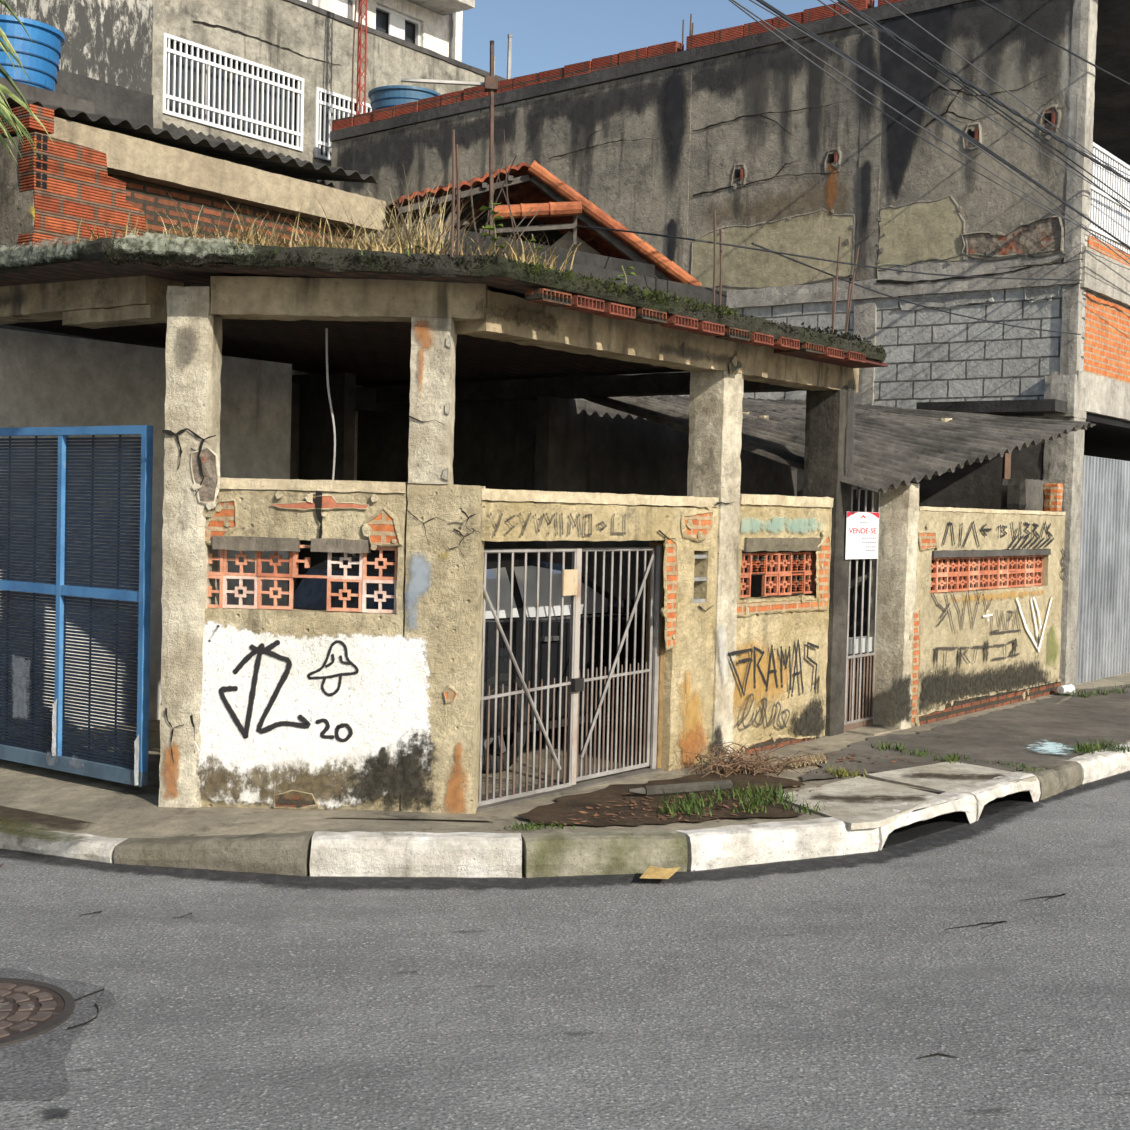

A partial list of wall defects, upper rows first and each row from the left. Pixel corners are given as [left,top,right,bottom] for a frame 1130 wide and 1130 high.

water stain [338,0,1074,200]
crack [693,101,847,197]
water stain [859,161,872,265]
flaking render [876,195,1067,279]
corrosion [415,320,431,391]
crack [162,428,216,495]
spalling [189,445,239,546]
crack [406,509,478,556]
flaking render [661,504,714,651]
water stain [891,635,1058,723]
water stain [196,732,437,810]
corrosion [445,743,466,814]